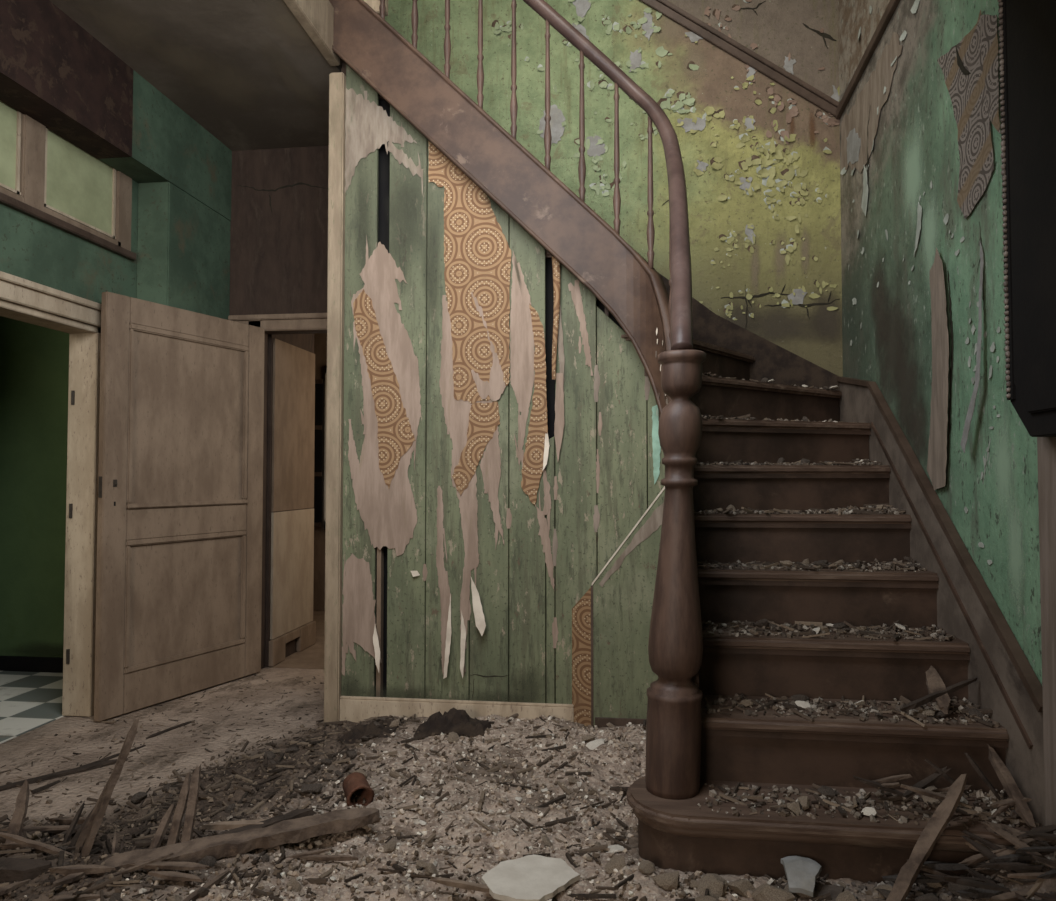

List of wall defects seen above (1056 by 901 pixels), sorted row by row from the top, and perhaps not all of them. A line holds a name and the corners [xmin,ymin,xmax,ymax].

flaking render [568,0,592,40]
peeling [601,8,672,72]
flaking render [685,32,703,43]
peeling [587,68,614,90]
flaking render [784,53,796,75]
flaking render [537,85,626,196]
peeling [657,65,829,268]
peeling [716,287,761,320]
peeling [768,280,837,308]
peeling [927,241,1000,491]
peeling [593,365,602,436]